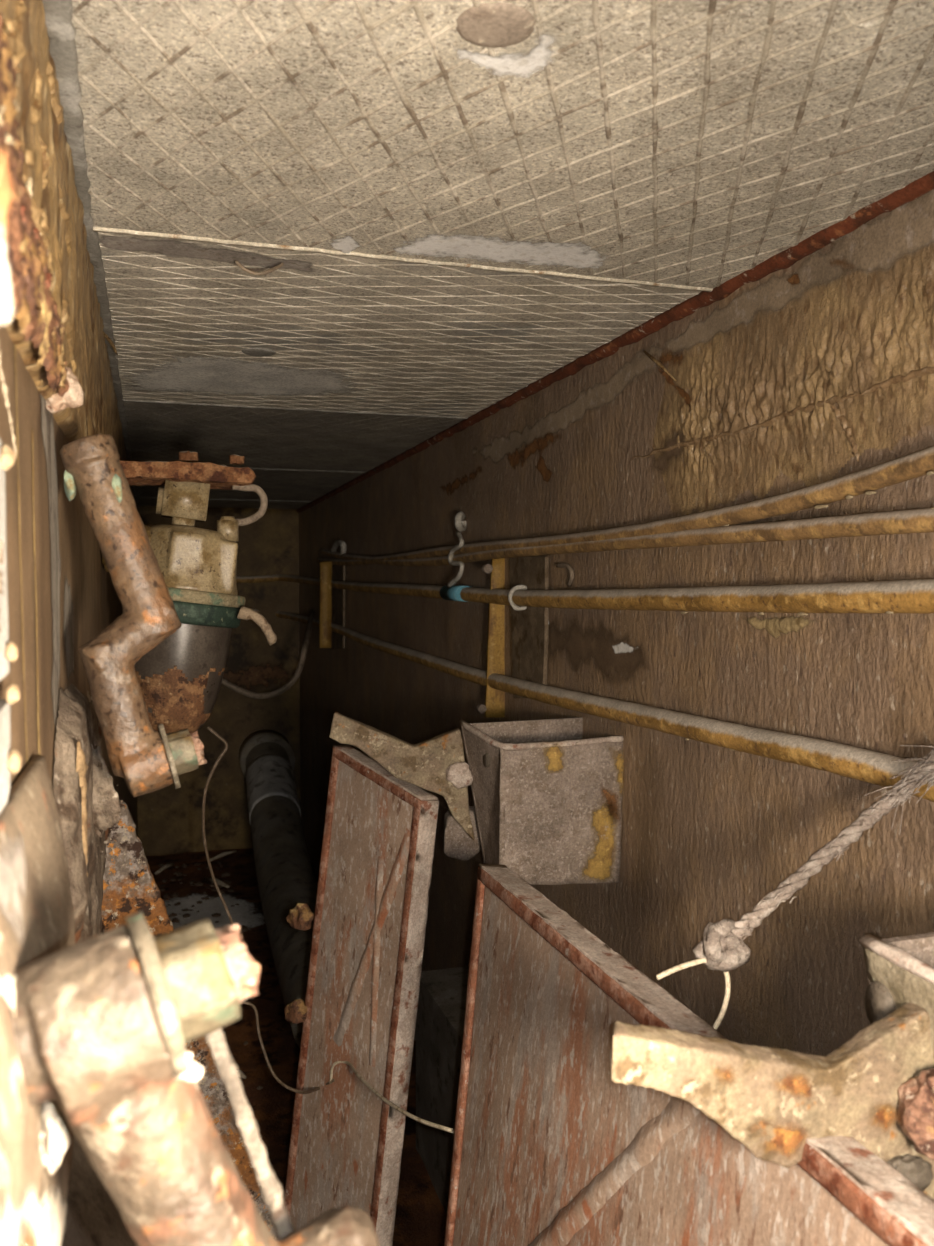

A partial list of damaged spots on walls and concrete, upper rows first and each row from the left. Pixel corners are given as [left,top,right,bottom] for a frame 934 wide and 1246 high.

water stain [459,35,554,78]
water stain [394,235,604,268]
rust [659,350,691,406]
rust [508,433,558,482]
water stain [548,620,644,680]